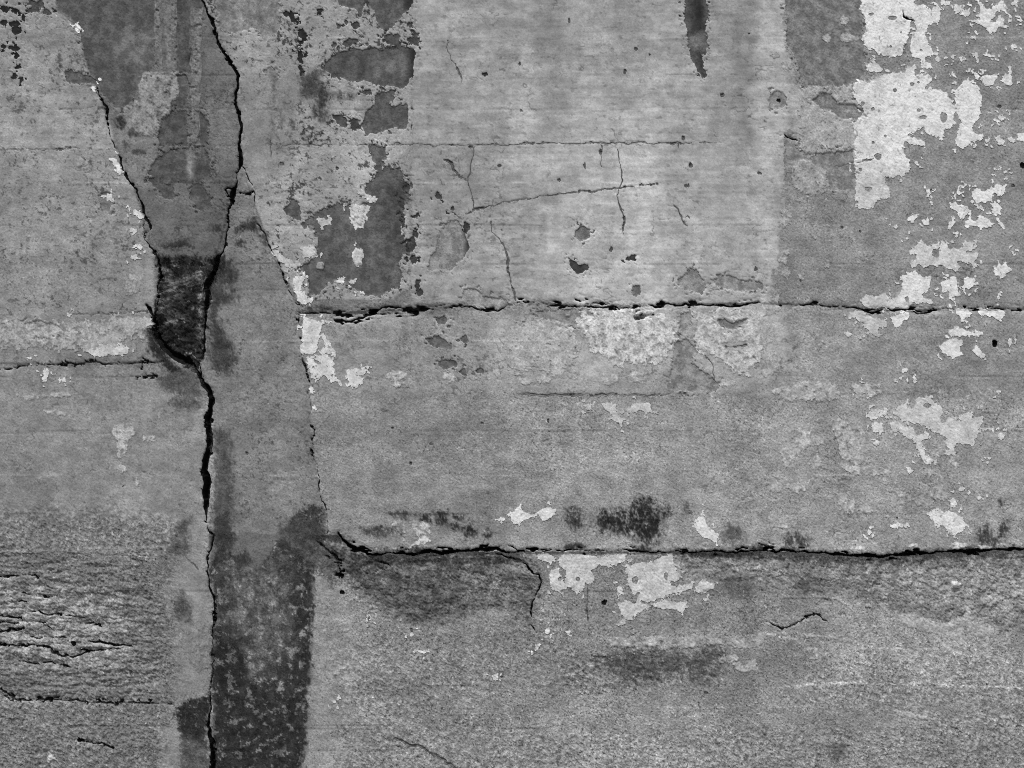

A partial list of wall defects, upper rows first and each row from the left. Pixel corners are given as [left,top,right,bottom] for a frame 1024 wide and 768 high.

peeling [781,0,1024,209]
crack [0,0,255,768]
damp [154,239,239,373]
damp [235,217,267,246]
damp [161,428,341,768]
peeling [271,0,470,410]
damp [564,542,601,553]
damp [597,497,670,552]
crack [256,141,1024,630]
spalling [329,510,1024,638]
peeling [853,378,1007,474]
peeling [844,162,1024,360]